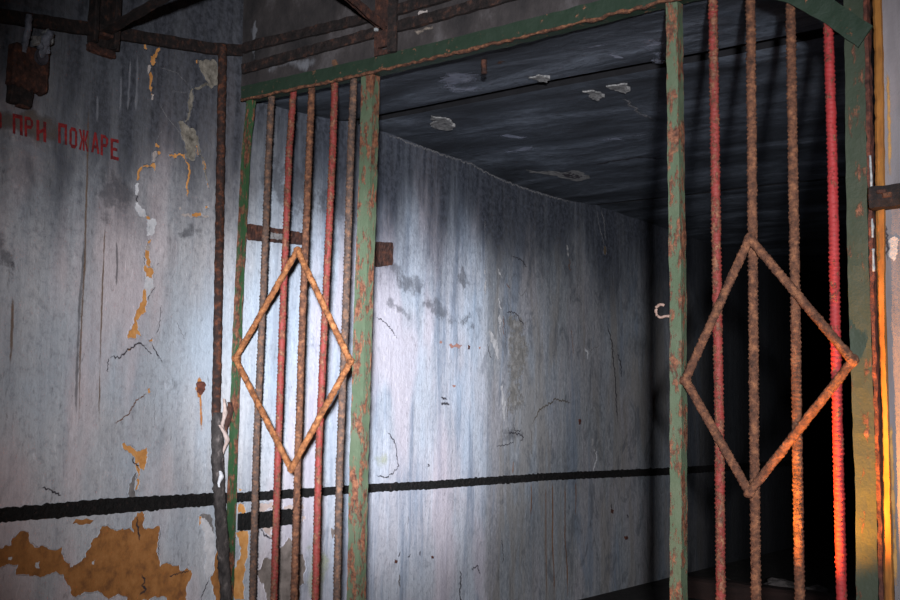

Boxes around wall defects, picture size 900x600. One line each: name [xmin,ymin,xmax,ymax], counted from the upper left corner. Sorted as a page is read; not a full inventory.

peeling [143,44,161,100]
peeling [529,74,550,83]
peeling [583,83,631,101]
peeling [430,115,455,131]
spalling [527,170,590,182]
flaking render [126,58,218,343]
crack [107,342,162,370]
crack [117,388,155,422]
rust [195,378,206,425]
crack [531,398,567,454]
peeling [121,442,149,497]
peeling [0,511,192,600]